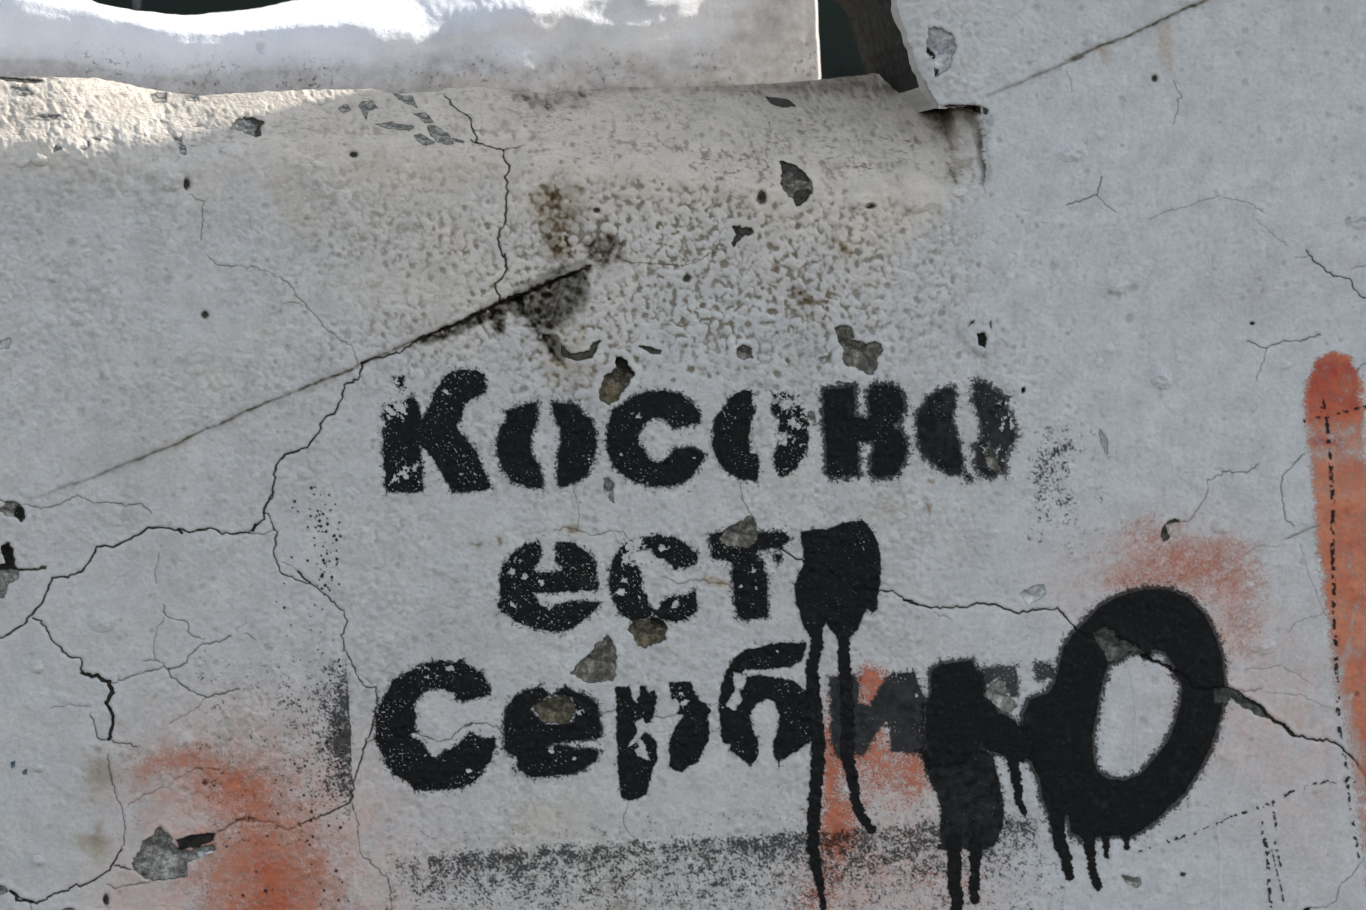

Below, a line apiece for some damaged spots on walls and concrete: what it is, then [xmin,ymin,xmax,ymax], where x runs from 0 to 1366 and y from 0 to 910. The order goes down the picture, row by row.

spalling [780,161,813,206]
spalling [819,325,883,375]
spalling [599,357,634,405]
crack [1,96,591,832]
spalling [0,542,46,598]
crack [857,589,1075,627]
spalling [571,635,617,683]
crack [1140,653,1170,670]
crack [1236,690,1361,770]
crack [9,850,131,904]
spalling [132,827,216,881]